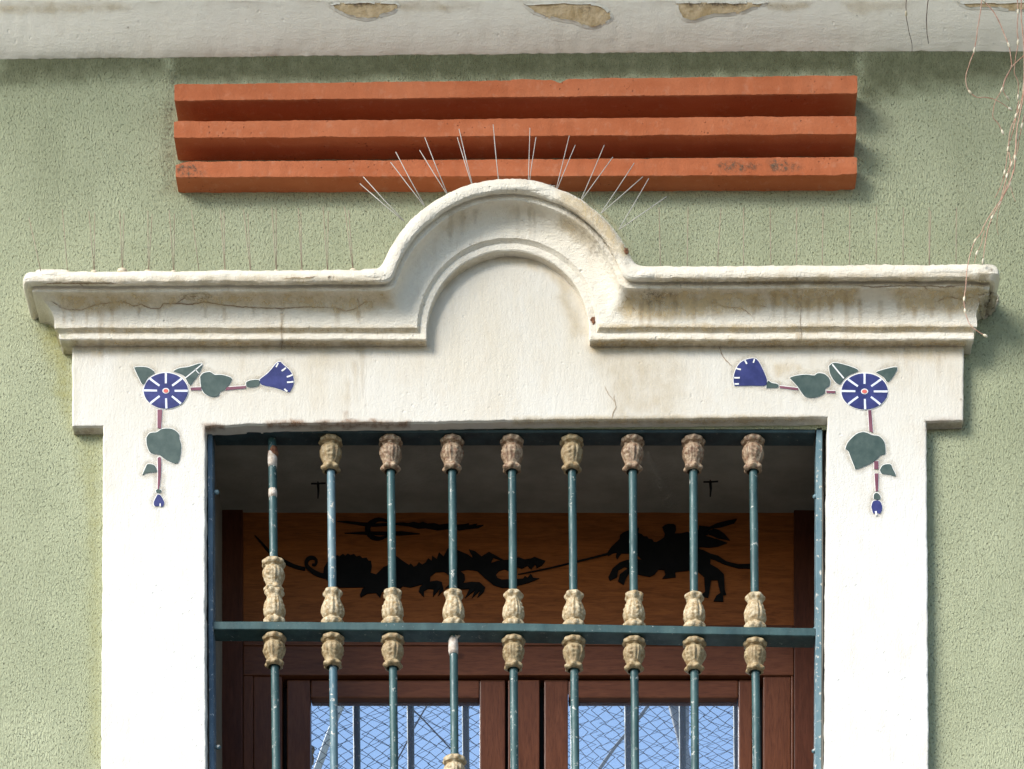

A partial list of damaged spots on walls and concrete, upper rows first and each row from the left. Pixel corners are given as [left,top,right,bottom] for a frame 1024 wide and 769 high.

peeling [326,1,401,21]
peeling [523,1,613,29]
peeling [675,0,769,23]
crack [47,282,368,351]
leakage [618,277,855,342]